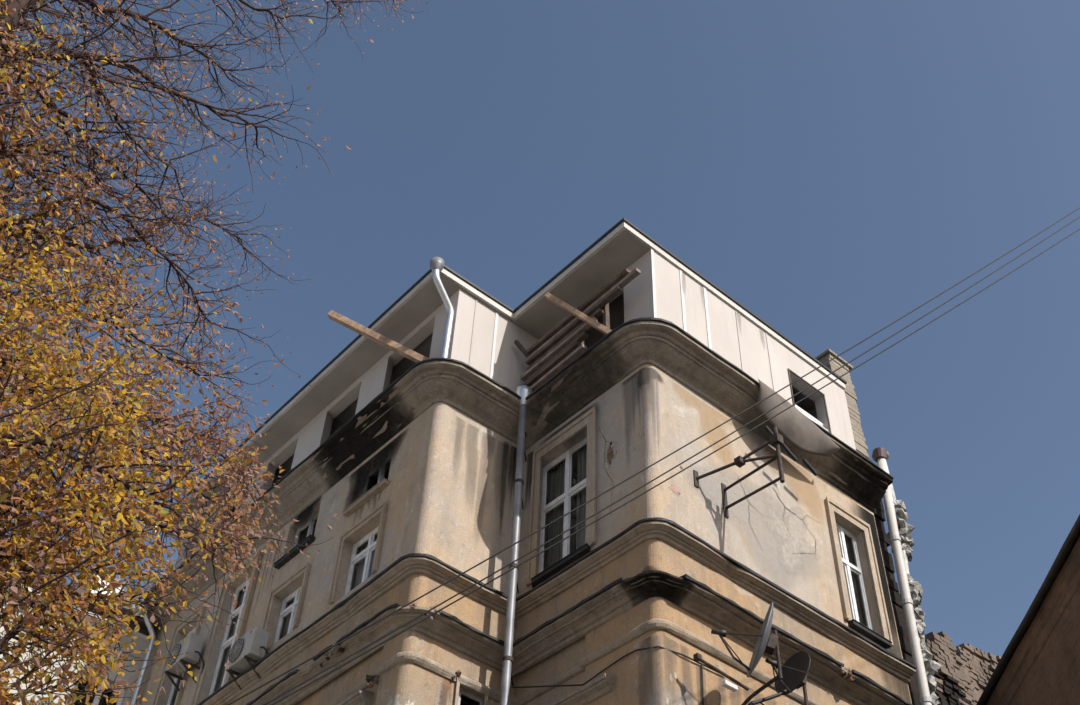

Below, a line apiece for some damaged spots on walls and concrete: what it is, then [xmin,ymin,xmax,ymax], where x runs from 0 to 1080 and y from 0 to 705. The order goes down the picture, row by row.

leakage [502,406,591,500]
crack [738,478,820,554]
leakage [621,569,693,605]